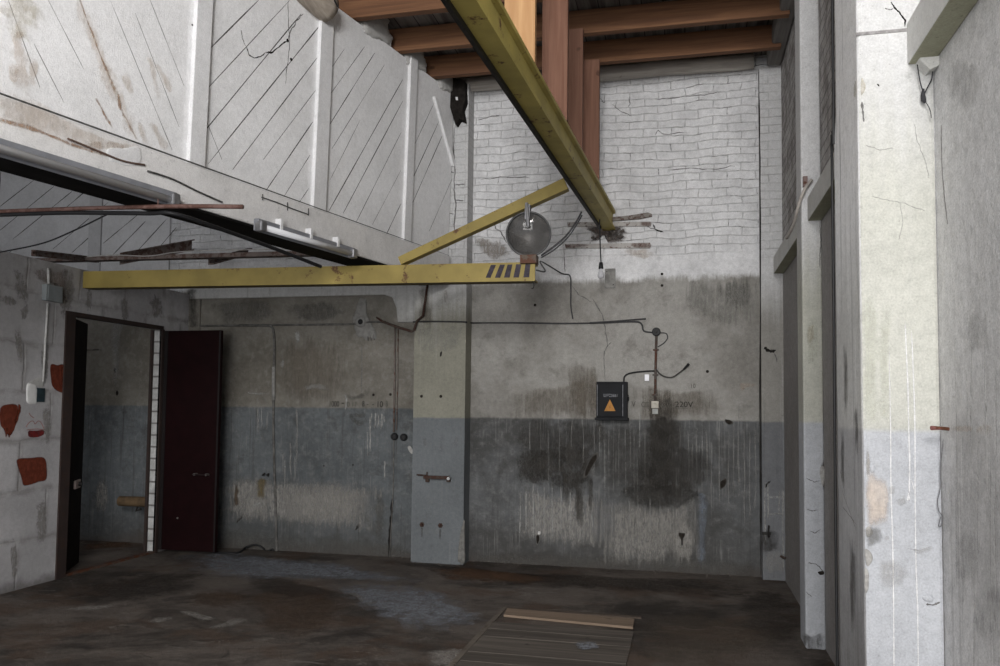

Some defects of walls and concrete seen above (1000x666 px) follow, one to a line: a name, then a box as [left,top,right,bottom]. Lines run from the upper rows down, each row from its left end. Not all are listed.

spalling [565,212,652,248]